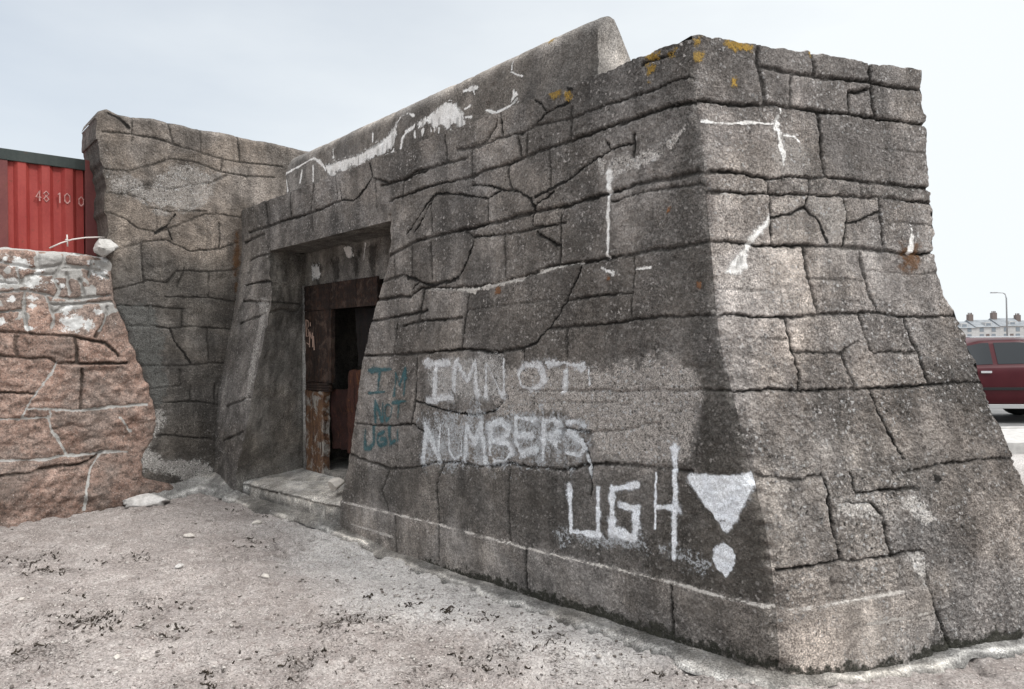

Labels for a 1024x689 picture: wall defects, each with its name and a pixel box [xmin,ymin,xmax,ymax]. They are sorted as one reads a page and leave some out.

crack [107,112,131,129]
crack [535,100,570,124]
crack [341,163,373,201]
crack [154,213,176,240]
crack [769,196,879,247]
crack [407,143,632,371]
rust [901,243,919,272]
crack [169,327,191,364]
crack [819,474,839,555]